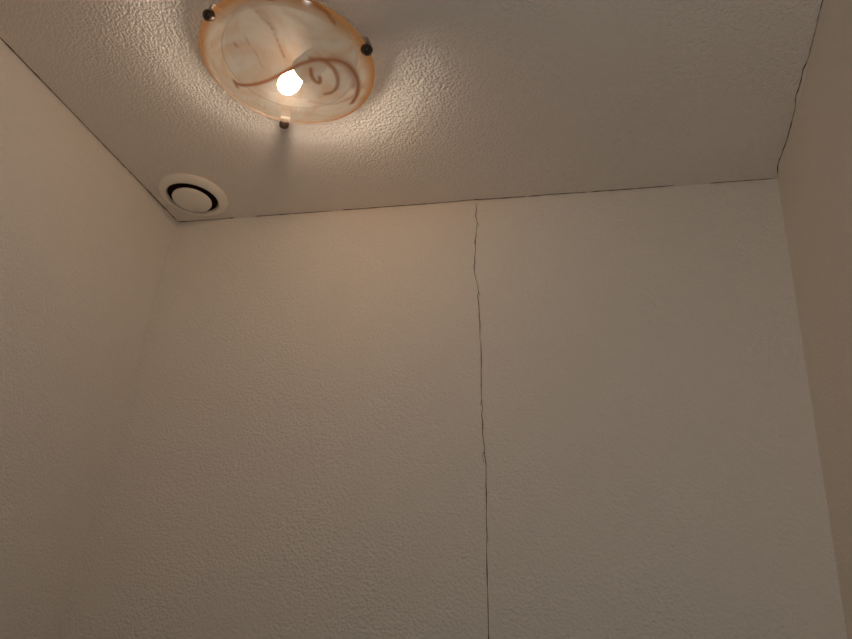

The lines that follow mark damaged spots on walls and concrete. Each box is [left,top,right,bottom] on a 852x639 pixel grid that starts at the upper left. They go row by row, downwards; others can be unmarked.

crack [715,0,825,183]
crack [255,185,674,639]